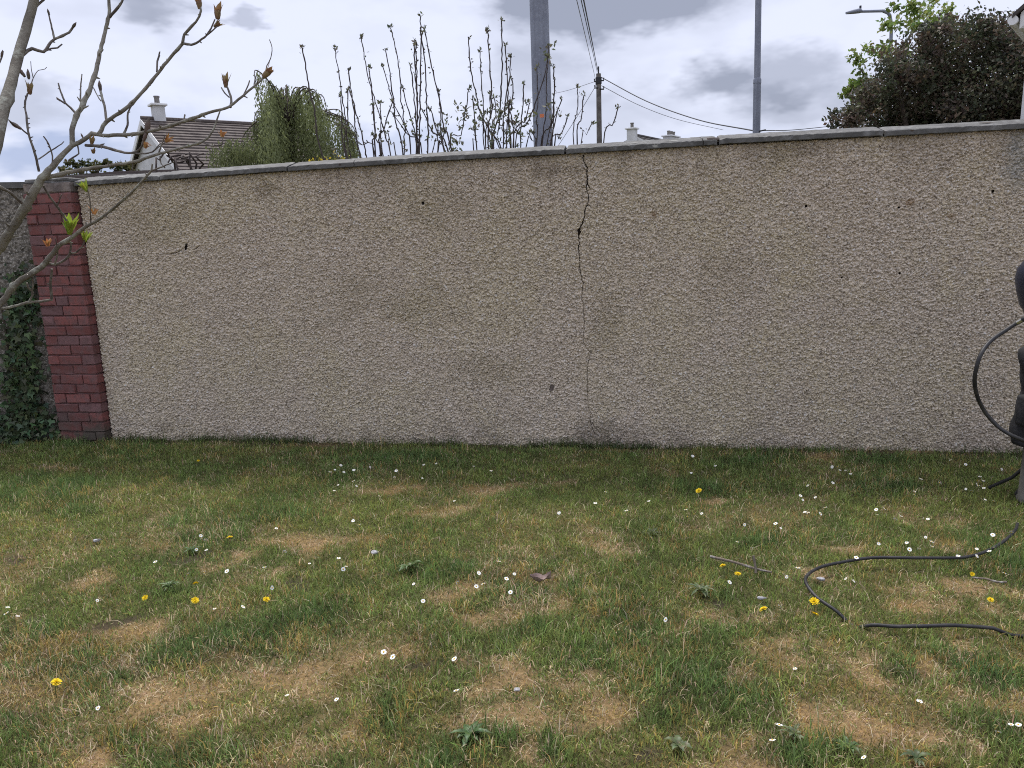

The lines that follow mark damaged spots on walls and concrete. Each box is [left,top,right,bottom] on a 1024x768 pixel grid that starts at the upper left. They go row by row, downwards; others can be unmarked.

crack [577,155,595,434]